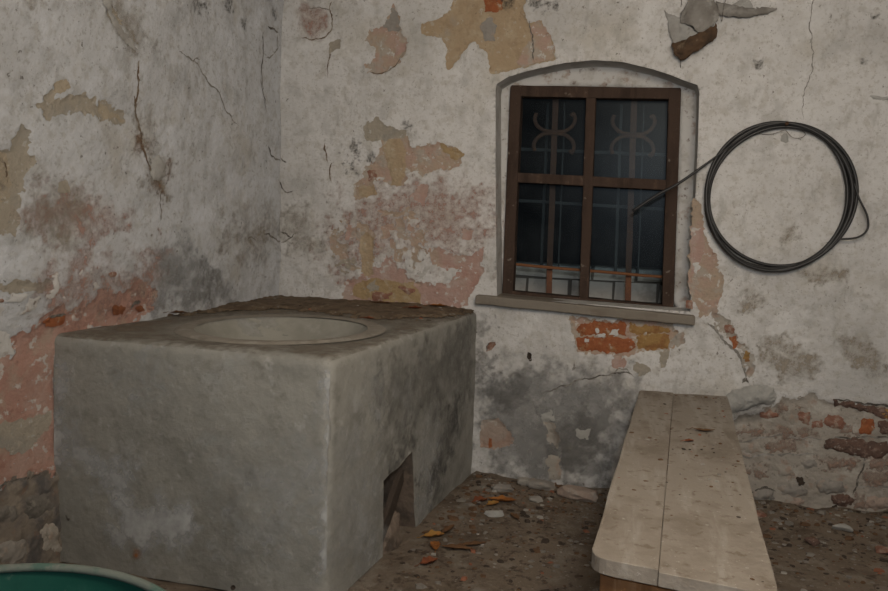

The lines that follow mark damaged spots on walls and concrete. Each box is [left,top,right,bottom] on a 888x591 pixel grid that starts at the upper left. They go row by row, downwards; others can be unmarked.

crack [102,0,170,219]
crack [180,51,239,126]
crack [261,26,278,107]
crack [268,146,292,193]
peeling [326,116,485,308]
peeling [421,0,556,74]
crack [802,0,814,120]
peeling [0,124,160,565]
spalling [568,315,685,376]
peeling [686,198,816,382]
leakage [478,369,631,488]
spalling [734,392,888,512]